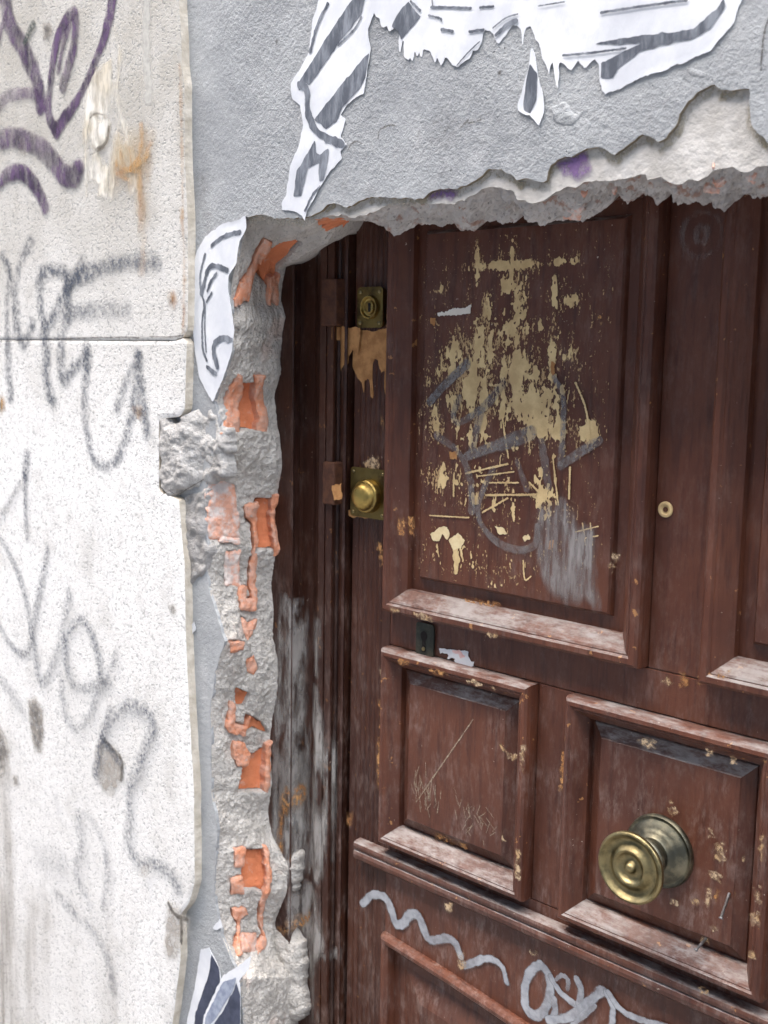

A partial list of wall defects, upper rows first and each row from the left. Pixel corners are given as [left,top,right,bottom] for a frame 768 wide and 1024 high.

spalling [165,901,188,956]
spalling [183,86,768,1024]